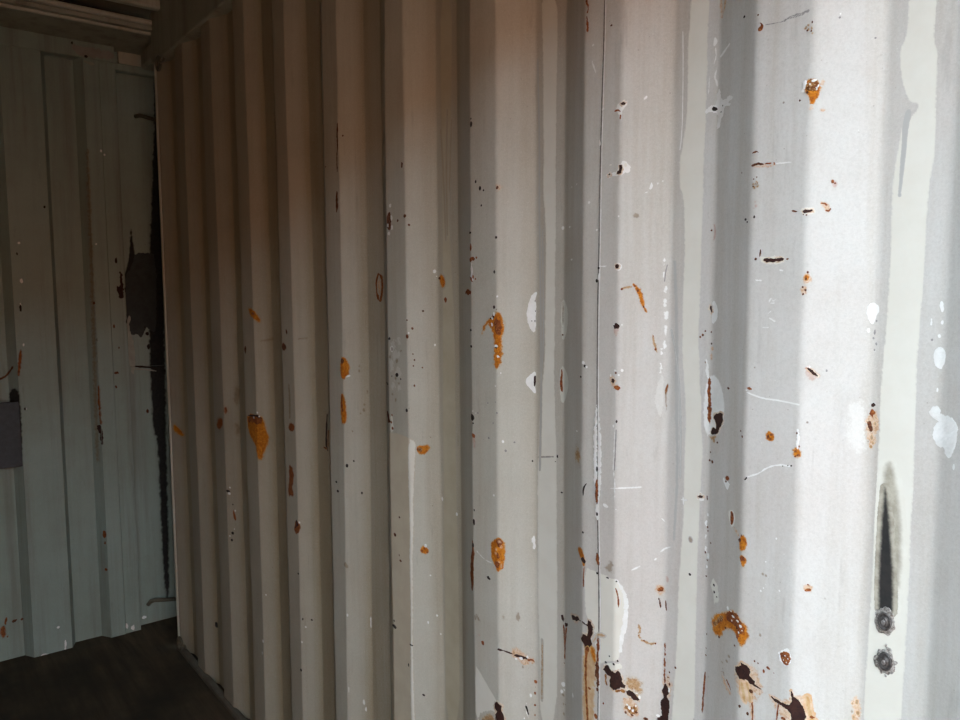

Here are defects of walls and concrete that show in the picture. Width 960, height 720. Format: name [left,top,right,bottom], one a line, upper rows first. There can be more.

corrosion [799,76,827,113]
corrosion [470,295,507,374]
peeling [526,292,537,332]
corrosion [620,282,649,314]
corrosion [216,385,271,462]
peeling [838,394,880,460]
peeling [929,406,958,470]
corrosion [489,536,507,574]
peeling [560,567,646,720]
corrosion [620,623,676,720]
corrosion [706,606,762,697]
spalling [733,658,822,720]